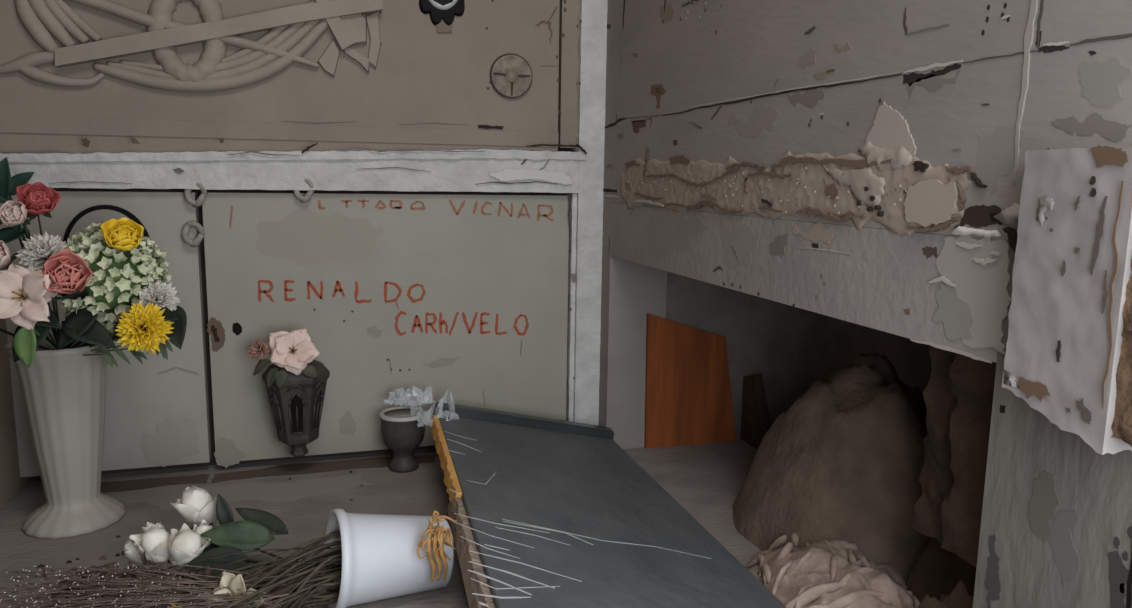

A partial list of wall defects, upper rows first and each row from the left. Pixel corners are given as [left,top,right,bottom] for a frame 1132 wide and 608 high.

crack [475,0,587,224]
crack [605,74,903,215]
peeling [620,151,1018,355]
peeling [1036,197,1055,232]
spalling [1074,145,1128,275]
spalling [1065,398,1092,424]